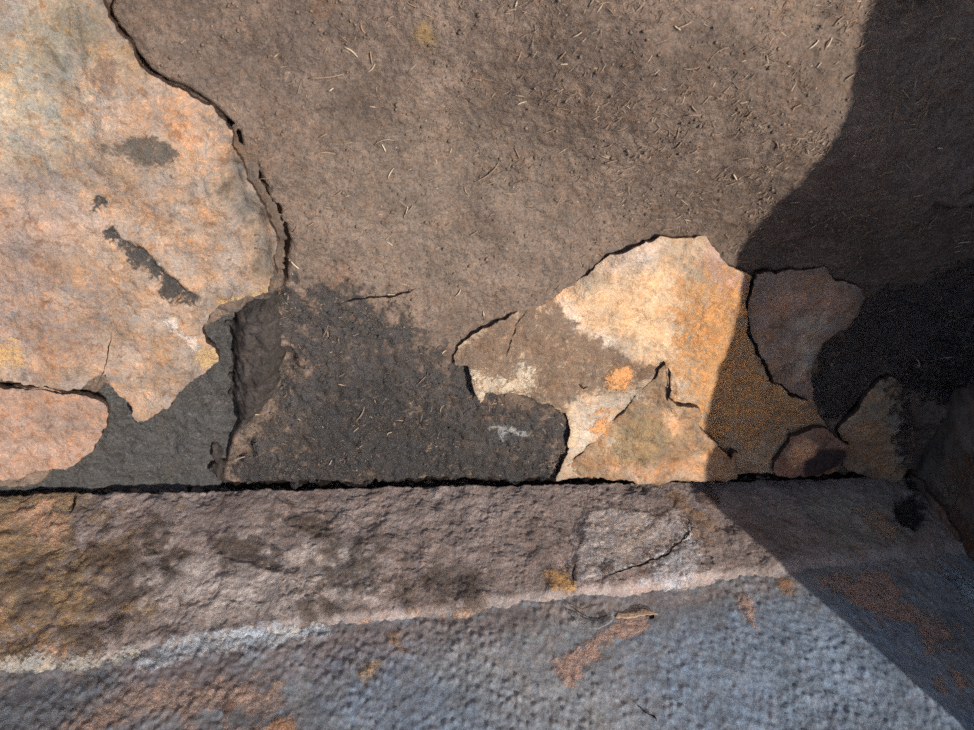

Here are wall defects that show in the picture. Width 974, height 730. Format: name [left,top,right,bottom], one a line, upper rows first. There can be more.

spalling [101,0,280,295]
spalling [90,195,108,213]
peeling [0,308,239,494]
leakage [220,273,576,491]
spalling [453,311,518,363]
crack [665,368,673,402]
spalling [577,235,909,444]
crack [745,278,777,386]
leakage [426,563,493,615]
crack [571,514,692,619]